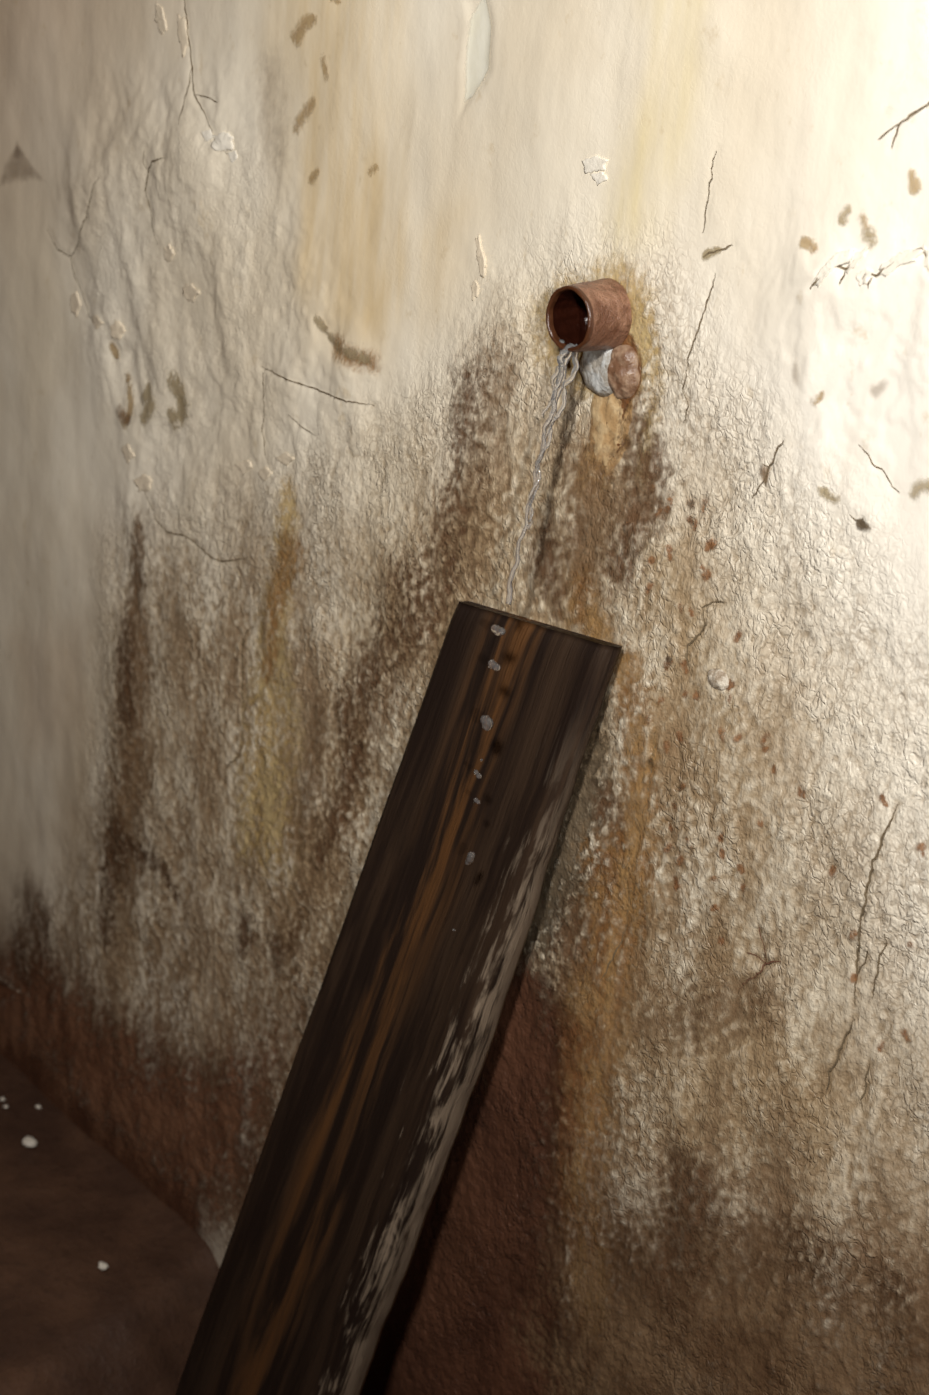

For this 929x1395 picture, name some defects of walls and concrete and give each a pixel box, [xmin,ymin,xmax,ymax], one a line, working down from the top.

water stain [99,521,180,945]
crack [143,151,165,242]
crack [178,0,227,154]
water stain [237,344,513,871]
rust [537,295,593,390]
water stain [536,407,671,619]
rust [565,263,717,580]
crack [878,102,929,149]
water stain [0,882,277,1232]
water stain [360,784,929,1395]
crack [826,803,899,1112]